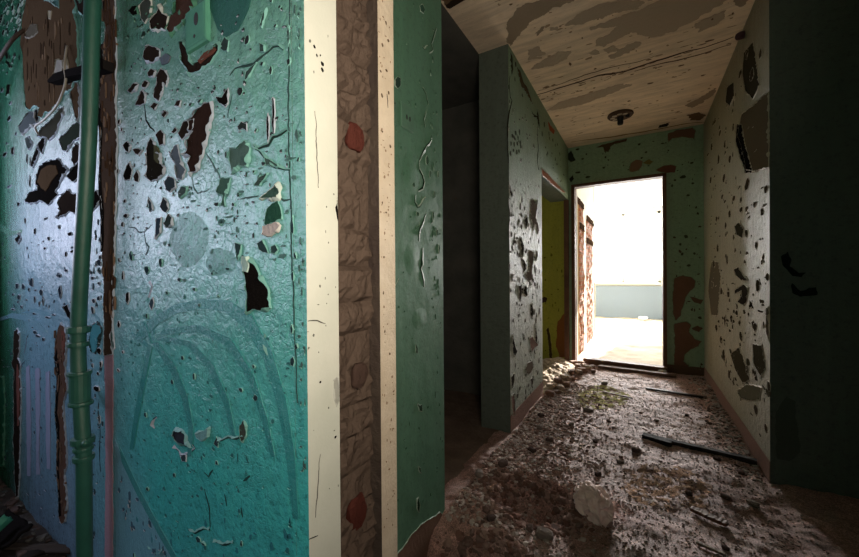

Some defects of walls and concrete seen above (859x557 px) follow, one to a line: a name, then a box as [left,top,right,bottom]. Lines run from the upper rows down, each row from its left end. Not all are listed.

flaking render [0,0,83,236]
flaking render [88,0,273,392]
flaking render [214,97,294,315]
peeling [260,0,292,66]
flaking render [541,148,591,193]
peeling [506,0,748,161]
flaking render [658,41,770,191]
peeling [715,185,768,249]
peeling [508,181,552,416]
spalling [545,360,596,397]
peeling [672,235,771,416]